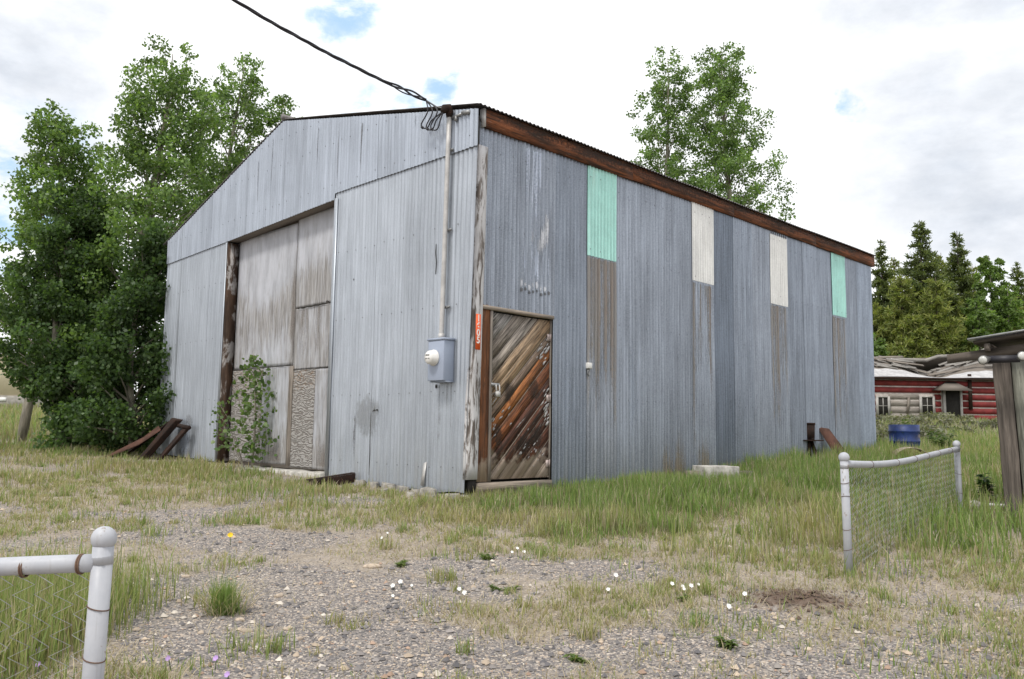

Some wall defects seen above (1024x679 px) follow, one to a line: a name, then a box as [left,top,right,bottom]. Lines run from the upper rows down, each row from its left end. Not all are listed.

corrosion [587,256,617,389]
corrosion [693,283,711,408]